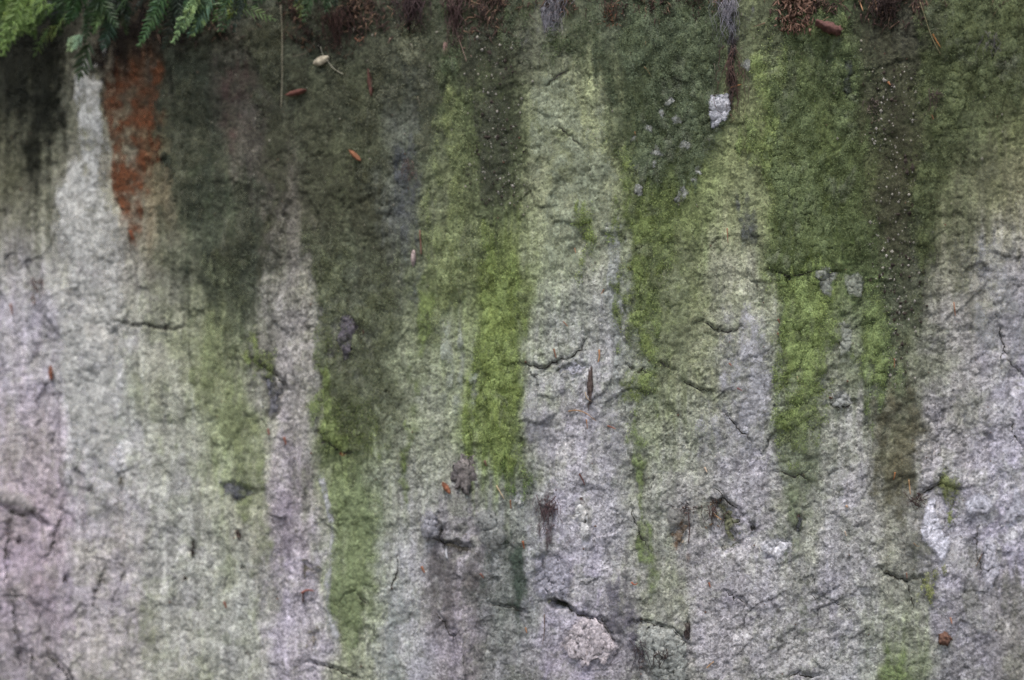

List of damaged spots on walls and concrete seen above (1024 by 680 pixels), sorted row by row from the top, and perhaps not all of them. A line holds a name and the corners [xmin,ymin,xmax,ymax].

corrosion [104,53,162,241]
water stain [456,0,630,382]
crack [116,317,183,330]
water stain [0,0,390,521]
crack [511,332,588,376]
crack [996,315,1024,376]
water stain [873,391,922,520]
crack [548,599,610,634]